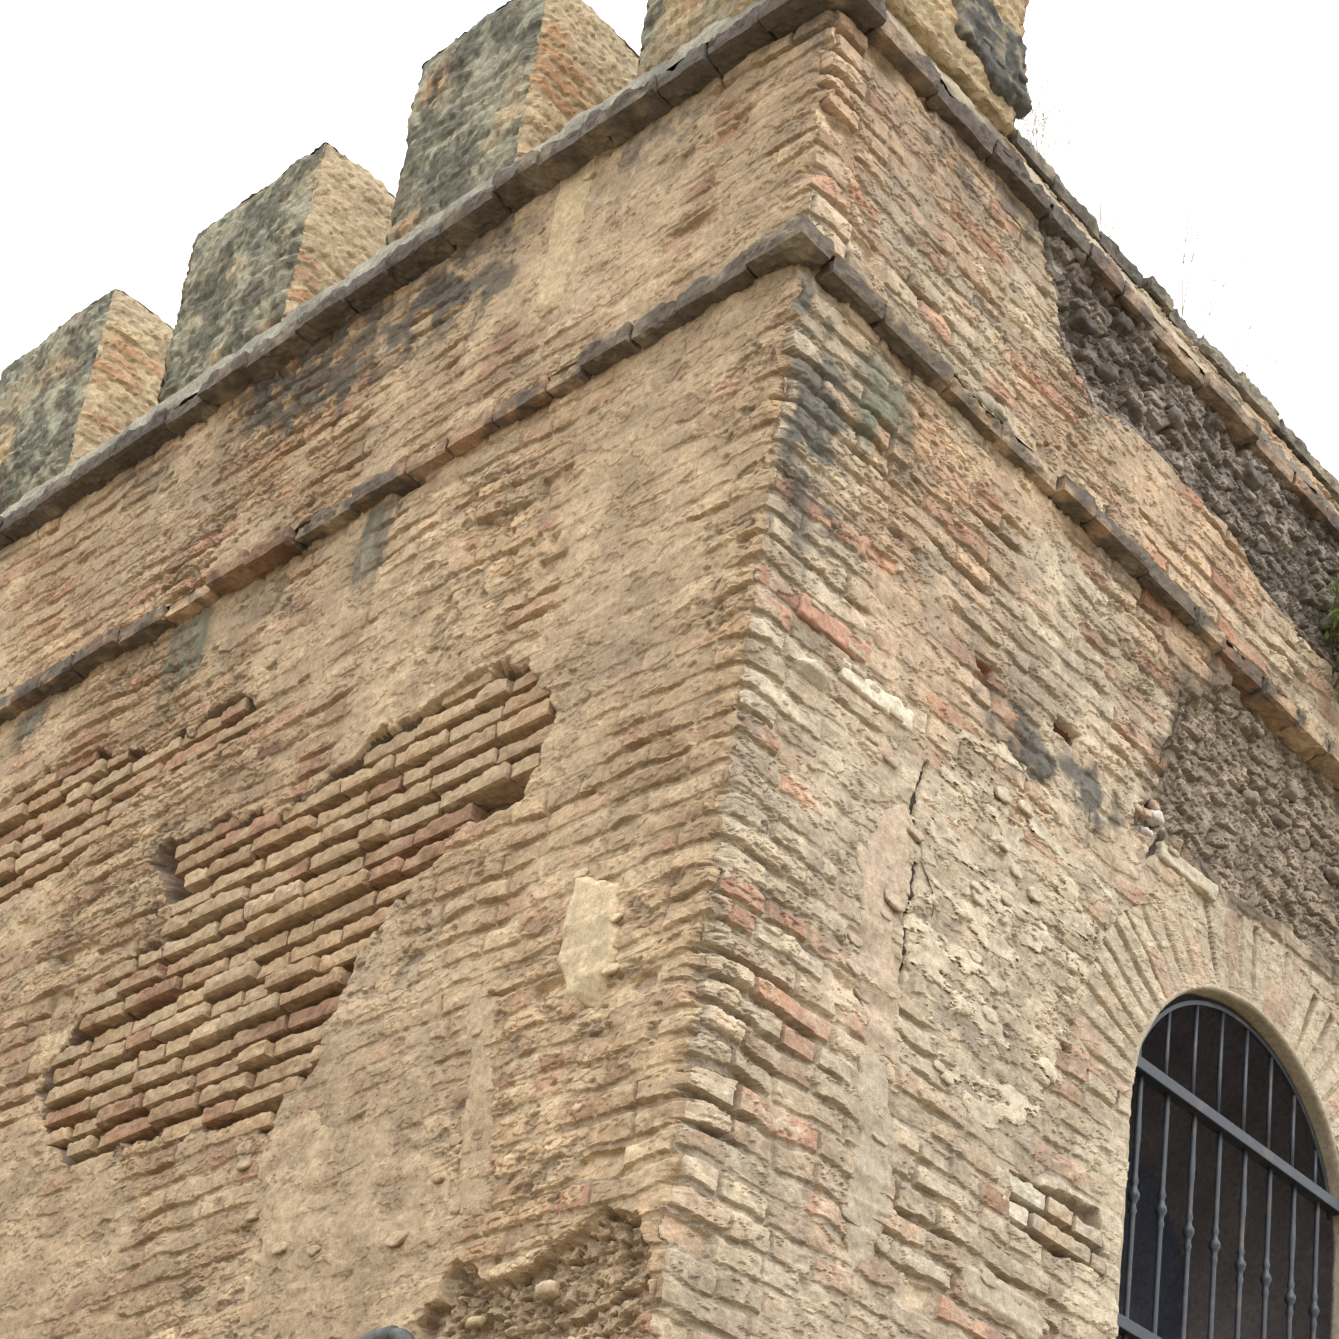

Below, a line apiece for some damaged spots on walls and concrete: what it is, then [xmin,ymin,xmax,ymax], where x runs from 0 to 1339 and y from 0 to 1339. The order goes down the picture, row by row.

spalling [1038,217,1339,672]
spalling [0,668,557,1172]
crack [899,764,934,973]
spalling [1132,659,1339,973]
spalling [419,1208,651,1339]